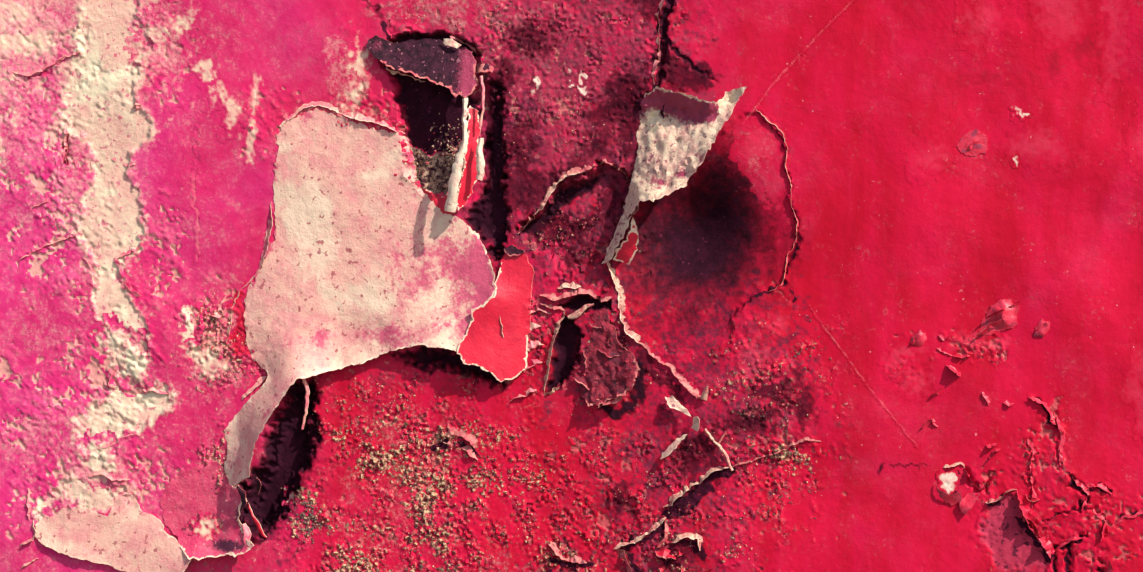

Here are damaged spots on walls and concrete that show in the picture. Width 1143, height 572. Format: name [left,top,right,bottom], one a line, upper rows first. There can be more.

crack [743,109,801,307]
peeling [20,0,773,572]
peeling [936,334,970,376]
crack [614,423,821,572]
peeling [936,462,1055,572]